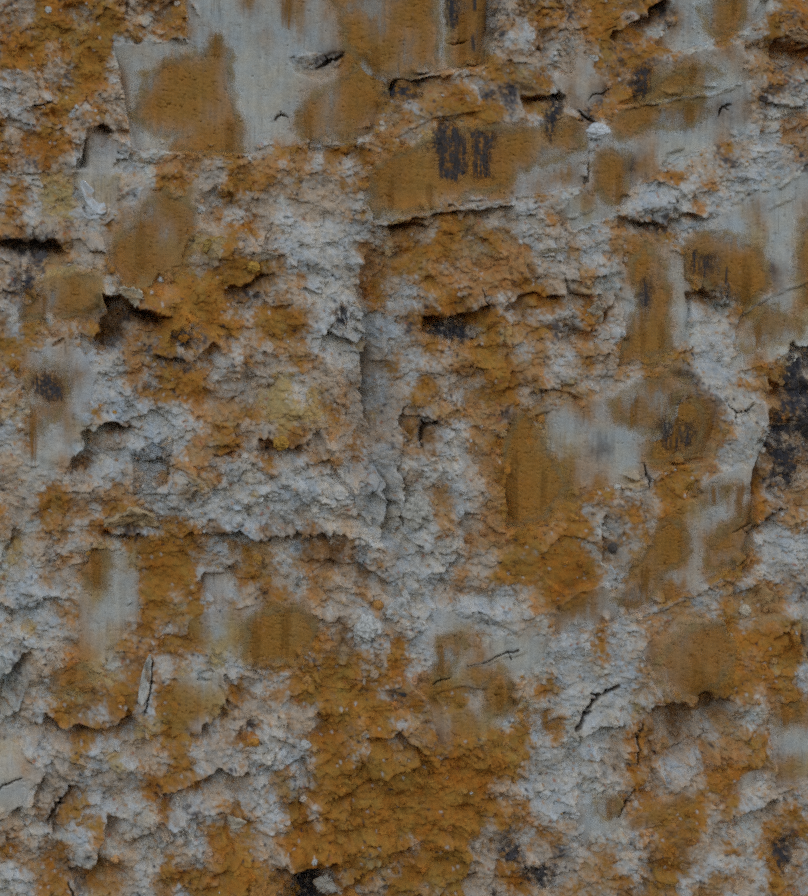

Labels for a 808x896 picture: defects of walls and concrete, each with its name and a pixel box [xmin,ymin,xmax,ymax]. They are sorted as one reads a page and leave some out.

rust [129,34,244,155]
rust [297,0,496,142]
rust [369,124,586,214]
rust [107,193,194,287]
spalling [373,197,621,406]
leakage [764,348,808,484]
crack [0,776,24,786]
spalling [0,654,152,744]
crack [572,682,621,733]
crack [618,721,644,818]
spalling [638,691,739,782]
leakage [295,868,322,896]